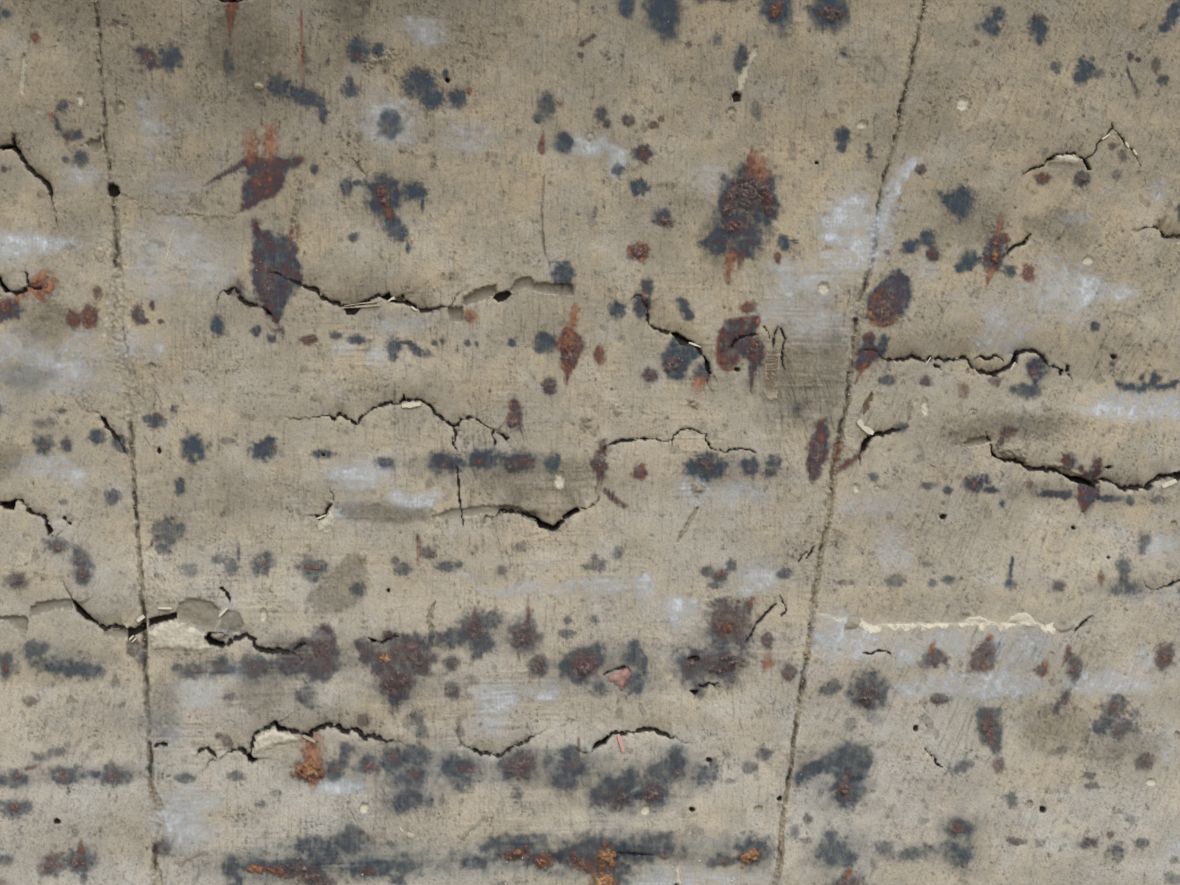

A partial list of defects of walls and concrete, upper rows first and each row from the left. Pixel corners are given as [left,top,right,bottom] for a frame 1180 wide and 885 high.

rust [213,134,303,209]
rust [251,222,303,332]
rust [642,302,764,389]
rust [855,269,911,381]
crack [867,349,1070,376]
crack [298,395,595,531]
crack [986,438,1180,492]
crack [71,597,177,643]
leakage [668,597,697,625]
leakage [627,640,647,694]
crack [198,720,395,763]
leakage [322,779,362,794]